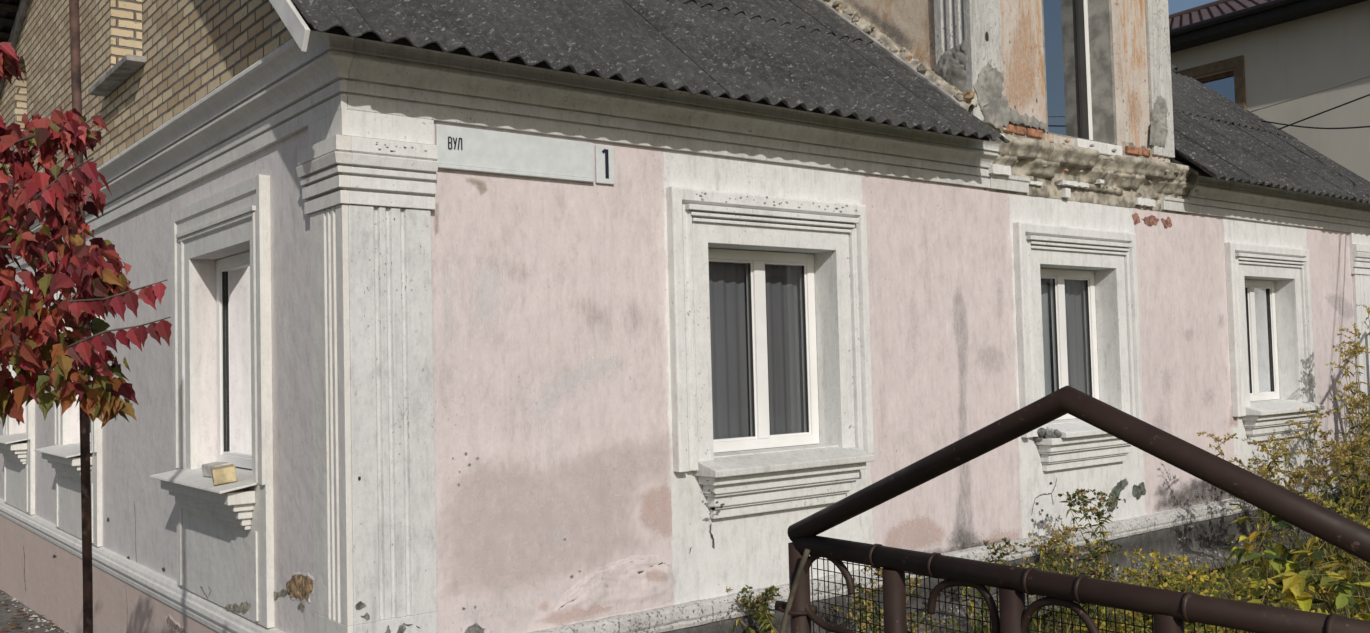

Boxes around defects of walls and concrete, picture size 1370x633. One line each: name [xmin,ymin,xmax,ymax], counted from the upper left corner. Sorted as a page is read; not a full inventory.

spalling [984,29,1200,228]
peeling [1105,477,1146,514]
water stain [1160,483,1233,506]
spalling [274,571,314,612]
spalling [225,601,250,614]
peeling [355,601,370,632]
peeling [385,623,420,633]
spalling [461,606,486,633]